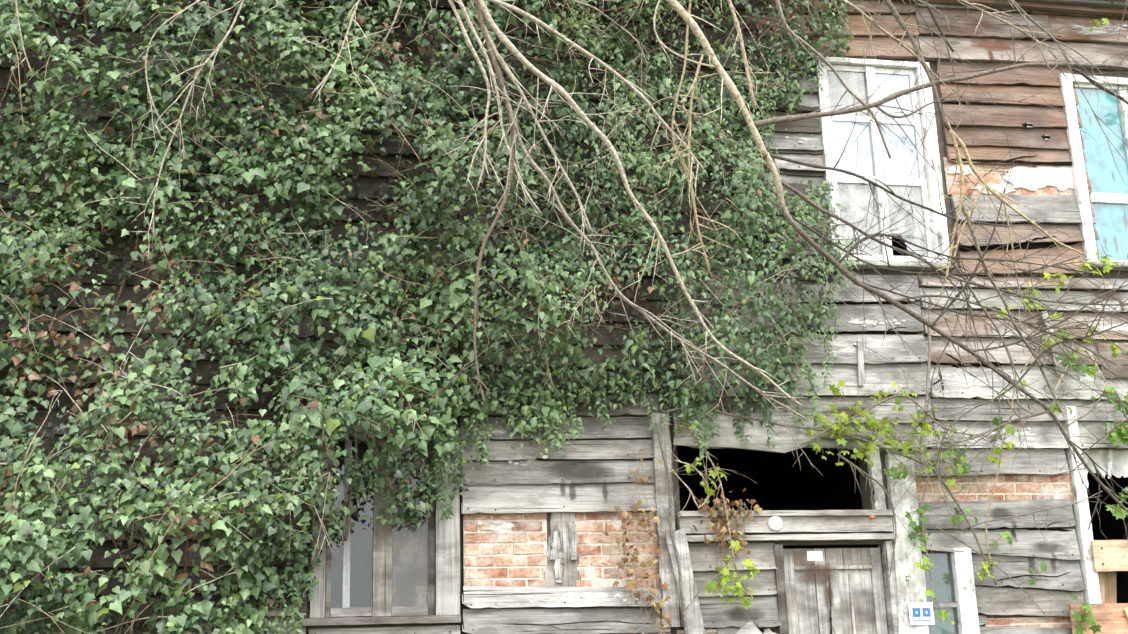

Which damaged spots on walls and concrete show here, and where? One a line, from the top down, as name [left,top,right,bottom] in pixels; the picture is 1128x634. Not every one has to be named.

spalling [943,158,1075,195]
flaking render [463,512,660,604]